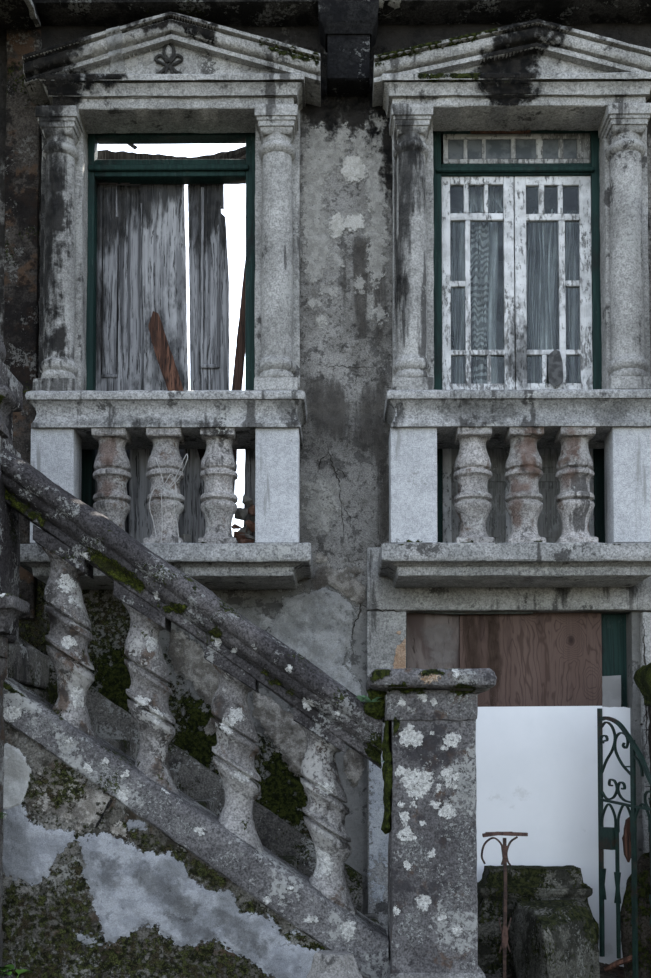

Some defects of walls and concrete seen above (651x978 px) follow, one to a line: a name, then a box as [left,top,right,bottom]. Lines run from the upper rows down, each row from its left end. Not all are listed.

leakage [471,19,573,120]
leakage [23,36,127,378]
leakage [97,184,226,257]
leakage [304,46,425,340]
crack [318,440,351,541]
spalling [252,691,307,796]
peeling [3,743,323,978]